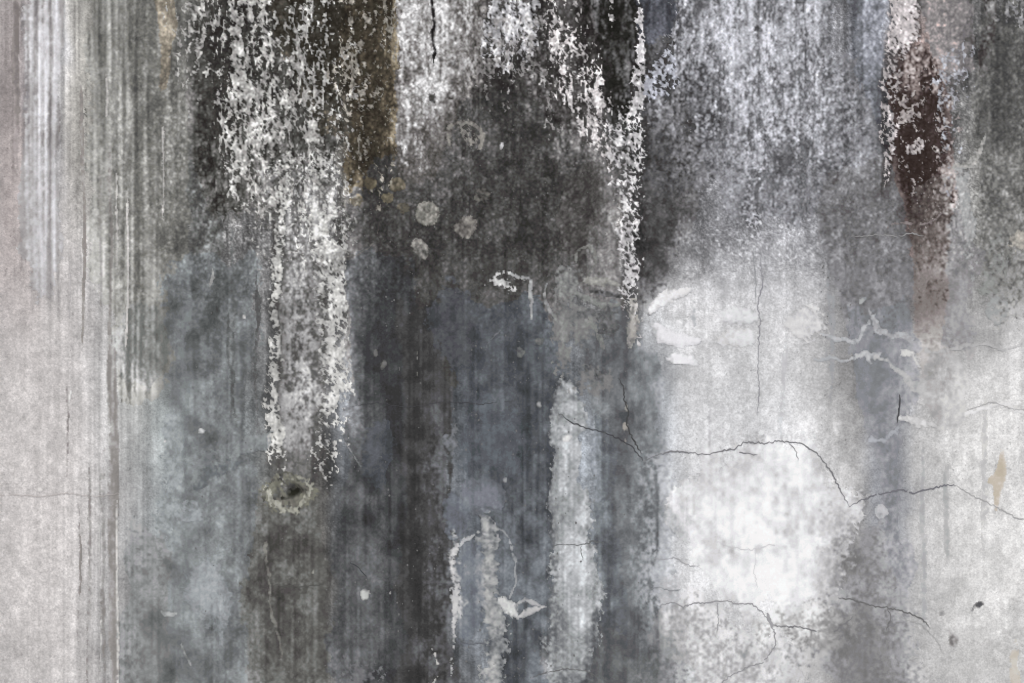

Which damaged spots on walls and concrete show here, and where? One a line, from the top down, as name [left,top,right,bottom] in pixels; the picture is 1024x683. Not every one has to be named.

spalling [258,471,320,516]
water stain [77,0,809,683]
crack [558,379,1023,519]
crack [647,539,944,683]
water stain [634,0,1024,683]
corrosion [885,43,959,369]